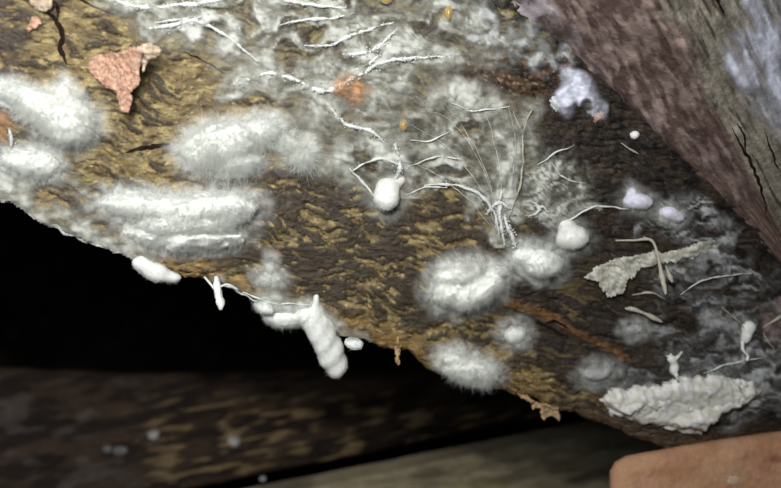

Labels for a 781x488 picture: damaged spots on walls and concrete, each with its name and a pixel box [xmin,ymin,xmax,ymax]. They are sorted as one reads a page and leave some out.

crack [45,1,67,64]
peeling [89,41,162,113]
leakage [725,0,781,105]
leakage [0,0,761,318]
crack [732,123,767,213]
crack [765,133,780,170]
leakage [213,261,363,379]
leakage [434,345,504,397]
leakage [504,325,525,347]
leakage [583,363,612,384]
leakage [599,298,781,435]